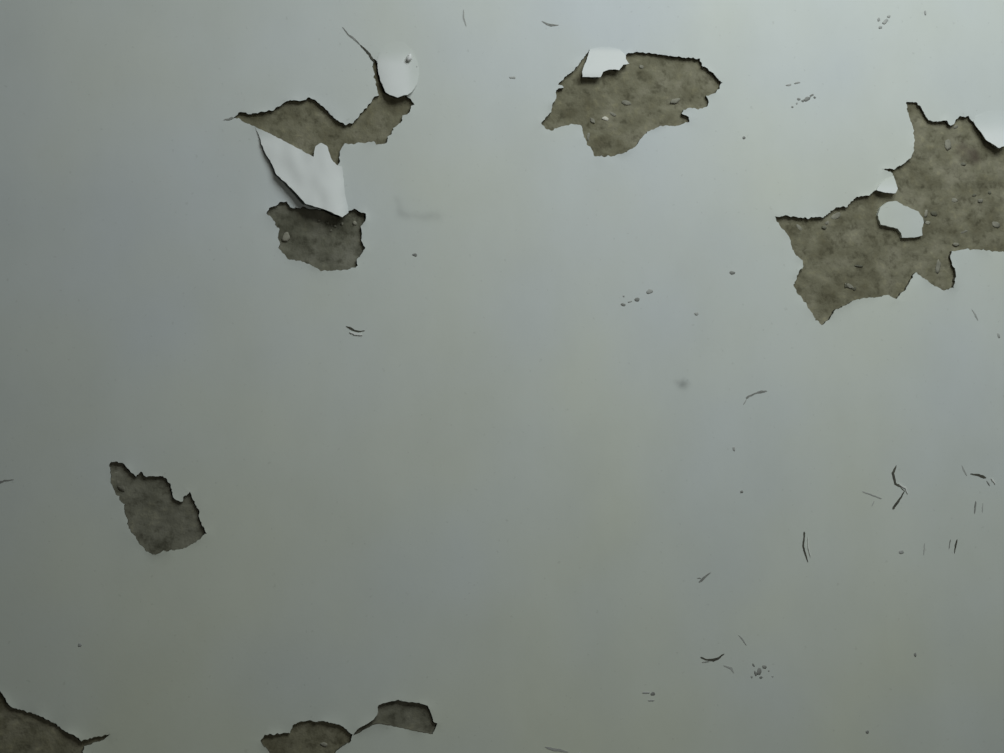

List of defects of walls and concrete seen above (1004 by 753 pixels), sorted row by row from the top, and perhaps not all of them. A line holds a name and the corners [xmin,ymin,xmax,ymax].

peeling [224,27,419,271]
peeling [541,47,721,157]
peeling [776,103,1004,325]
peeling [110,461,206,554]
peeling [0,692,108,753]
peeling [261,700,437,753]